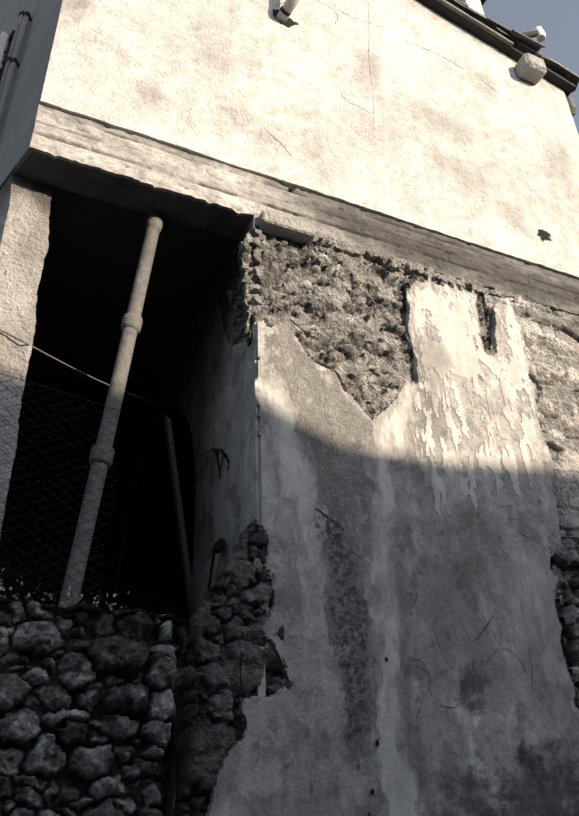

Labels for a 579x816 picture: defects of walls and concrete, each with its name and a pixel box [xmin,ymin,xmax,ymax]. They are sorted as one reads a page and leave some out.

crack [316,0,463,130]
spalling [537,229,551,242]
spalling [227,225,543,768]
spalling [169,519,293,816]
crack [410,624,462,724]